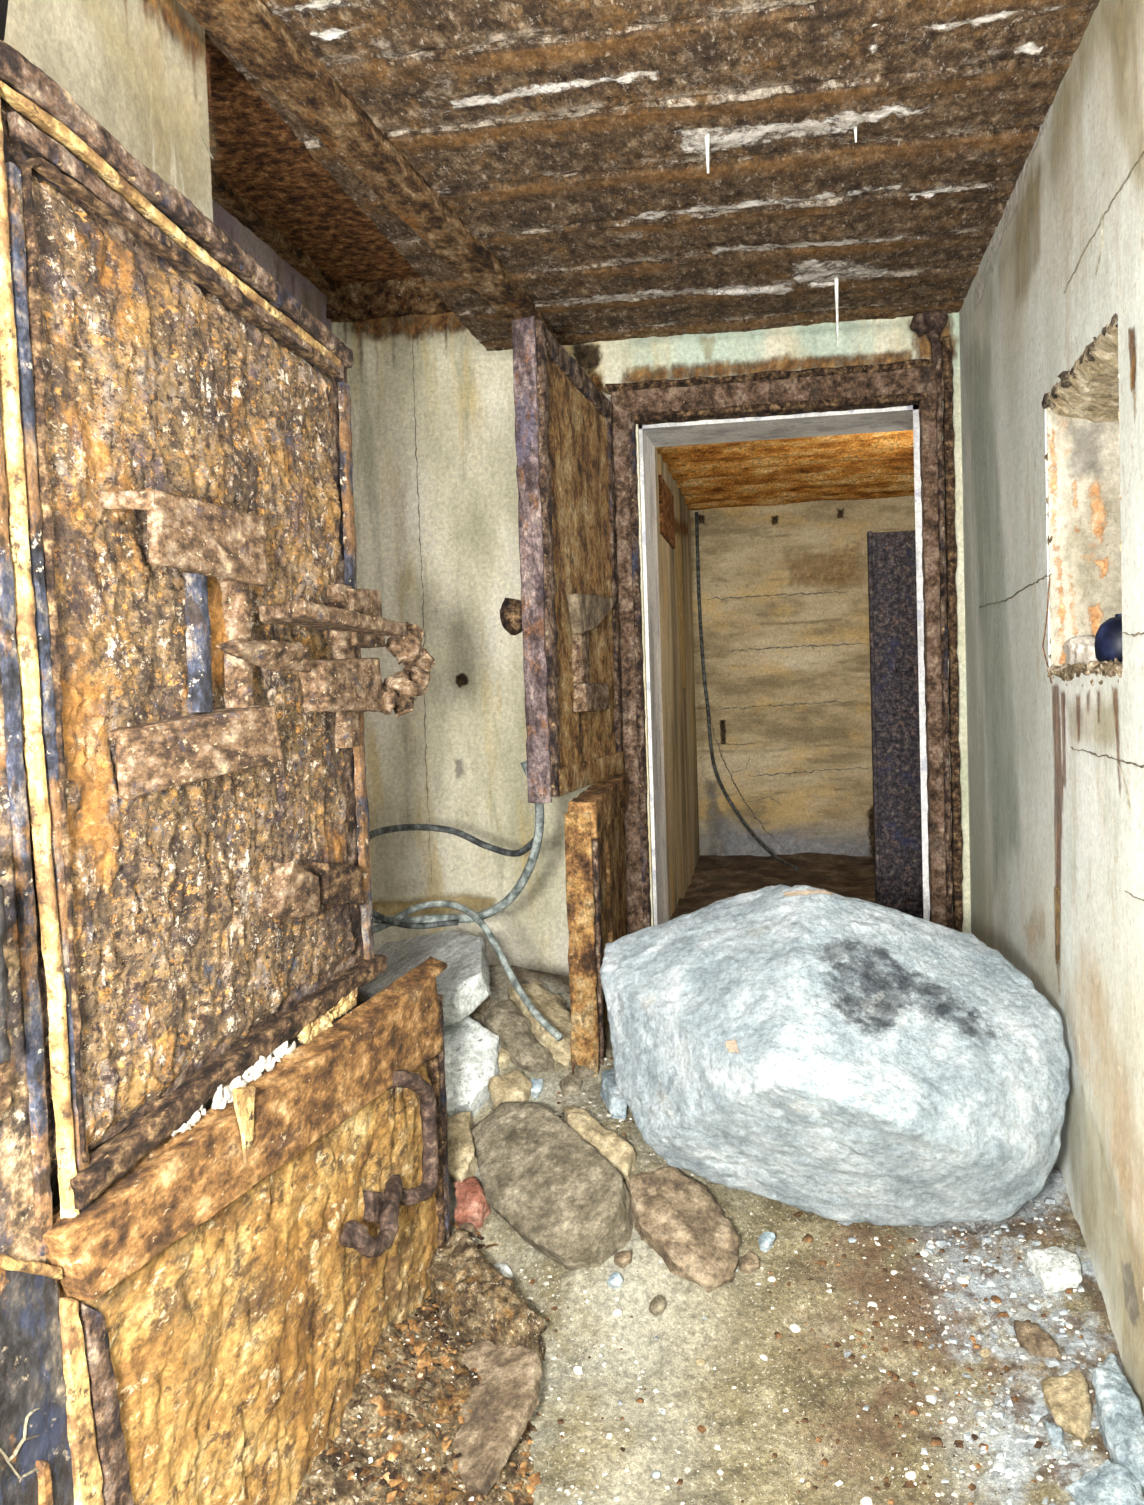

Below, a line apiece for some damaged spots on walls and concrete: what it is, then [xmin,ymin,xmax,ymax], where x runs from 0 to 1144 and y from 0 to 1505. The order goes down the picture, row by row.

efflorescence [448,71,657,112]
efflorescence [674,105,929,156]
crack [1063,151,1144,294]
spalling [1041,313,1123,686]
rust [1052,686,1066,990]